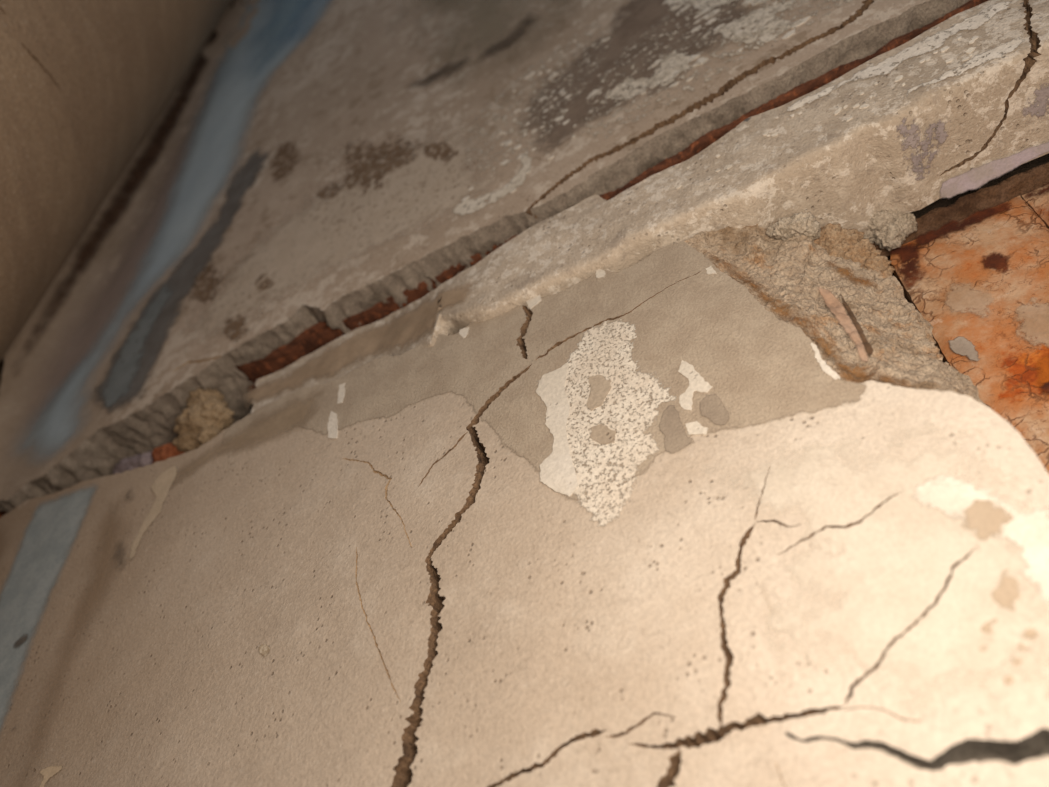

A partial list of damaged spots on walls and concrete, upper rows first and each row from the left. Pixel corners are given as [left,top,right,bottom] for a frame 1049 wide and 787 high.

water stain [188,259,281,340]
water stain [269,142,300,181]
corrosion [236,235,517,392]
water stain [306,135,469,239]
crack [0,0,970,515]
peeling [222,211,992,526]
peeling [451,0,839,216]
corrosion [600,0,989,200]
peeling [775,1,1025,122]
corrosion [890,203,1010,287]
crack [343,272,699,787]
crack [488,467,1049,787]